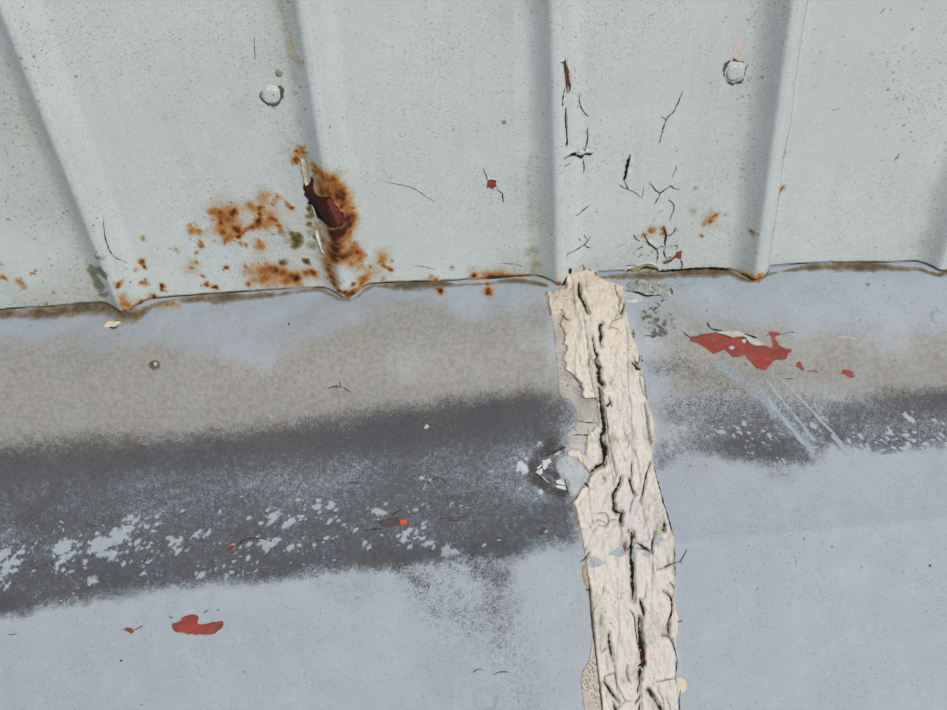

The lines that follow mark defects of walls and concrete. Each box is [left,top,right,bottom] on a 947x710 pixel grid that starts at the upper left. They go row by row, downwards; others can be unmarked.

crack [564,92,592,170]
corrosion [186,194,295,290]
corrosion [244,145,394,298]
crack [620,154,680,259]
peeling [683,322,817,379]
water stain [672,379,947,466]
water stain [0,390,578,617]
crack [561,283,687,710]
peeling [170,609,225,636]